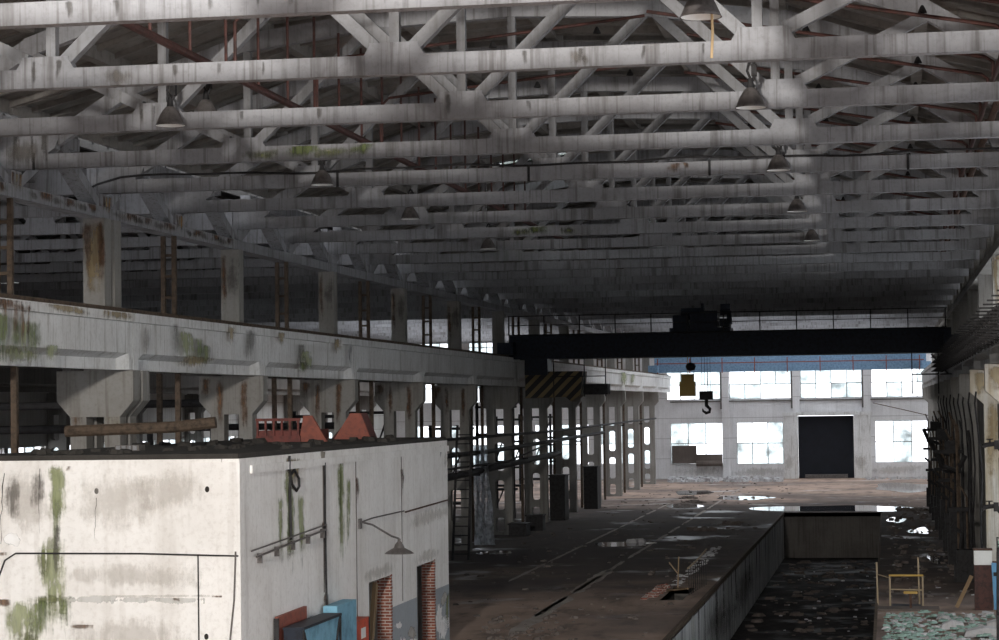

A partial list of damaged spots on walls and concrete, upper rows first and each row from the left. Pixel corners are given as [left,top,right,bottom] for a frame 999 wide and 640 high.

corrosion [32,192,232,244]
corrosion [84,223,104,289]
water stain [0,314,58,359]
water stain [174,326,210,366]
water stain [278,459,304,552]
water stain [338,464,350,544]
water stain [7,468,205,640]